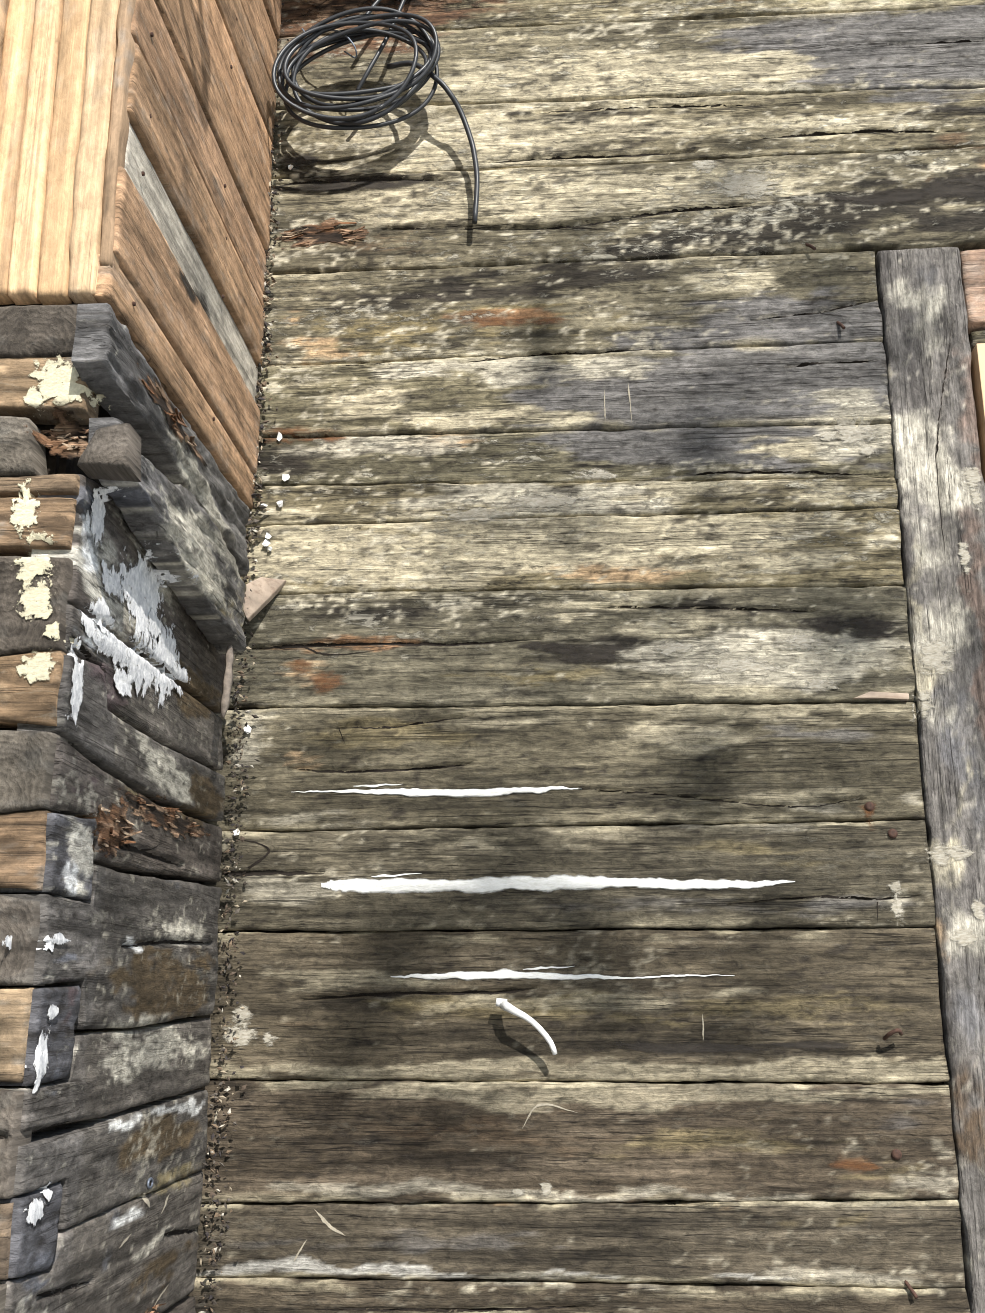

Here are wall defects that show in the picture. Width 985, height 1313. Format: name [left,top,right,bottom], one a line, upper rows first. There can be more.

peeling [23,355,110,421]
peeling [9,478,199,728]